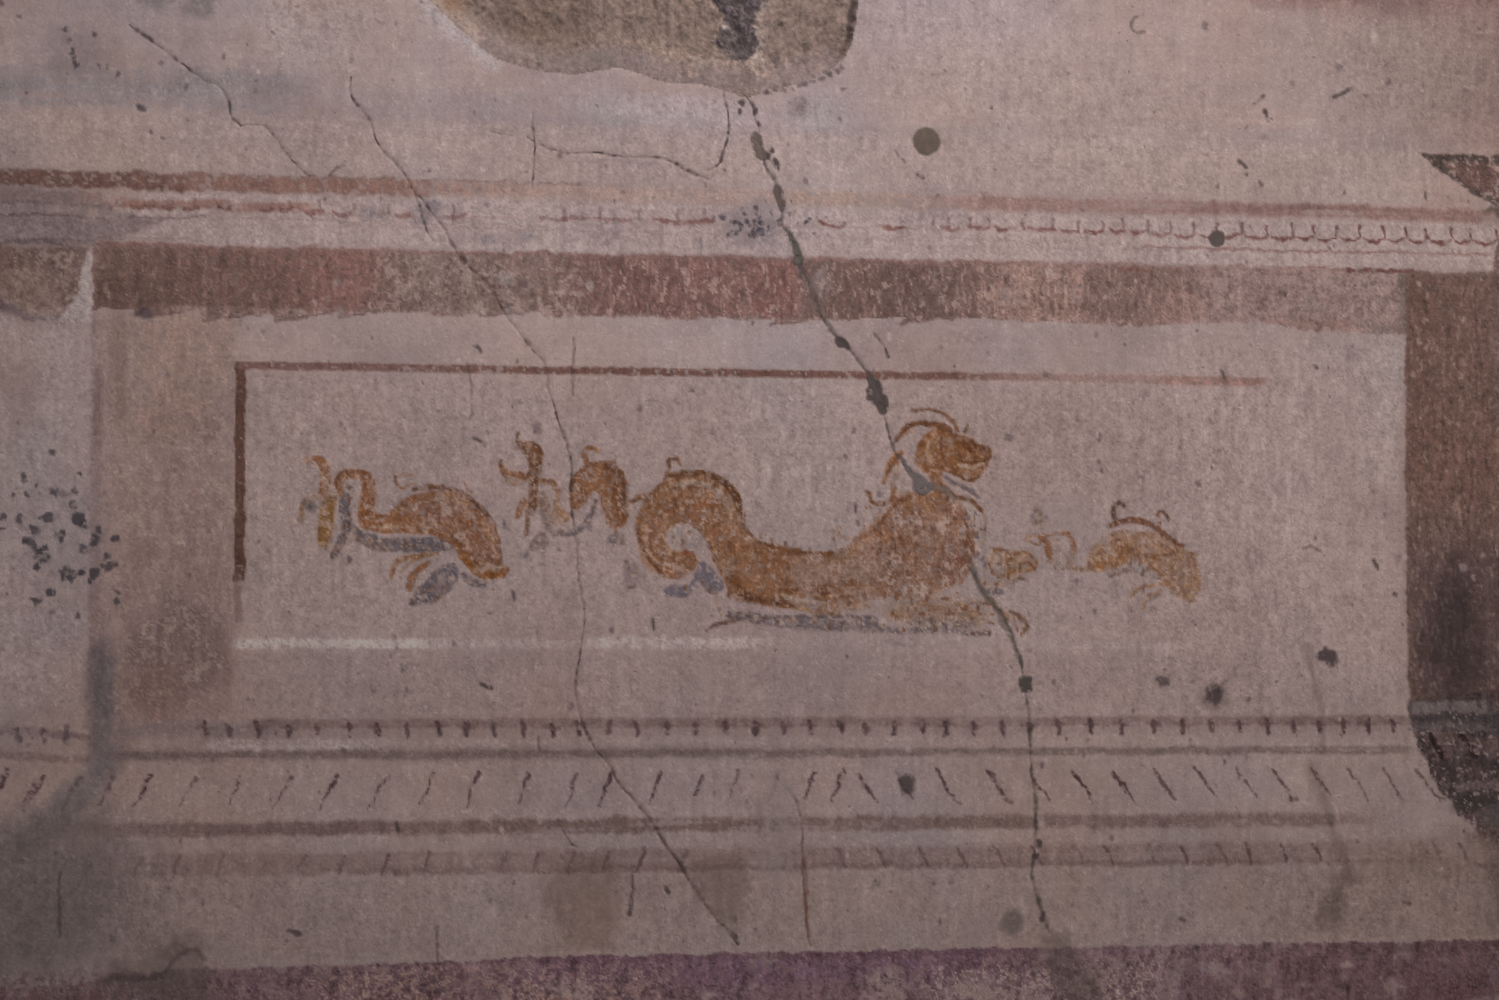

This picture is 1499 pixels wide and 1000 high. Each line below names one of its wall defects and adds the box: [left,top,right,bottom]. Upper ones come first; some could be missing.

flaking render [429,0,859,98]
crack [657,100,803,268]
crack [820,314,955,499]
crack [967,562,1048,927]
crack [800,838,808,926]